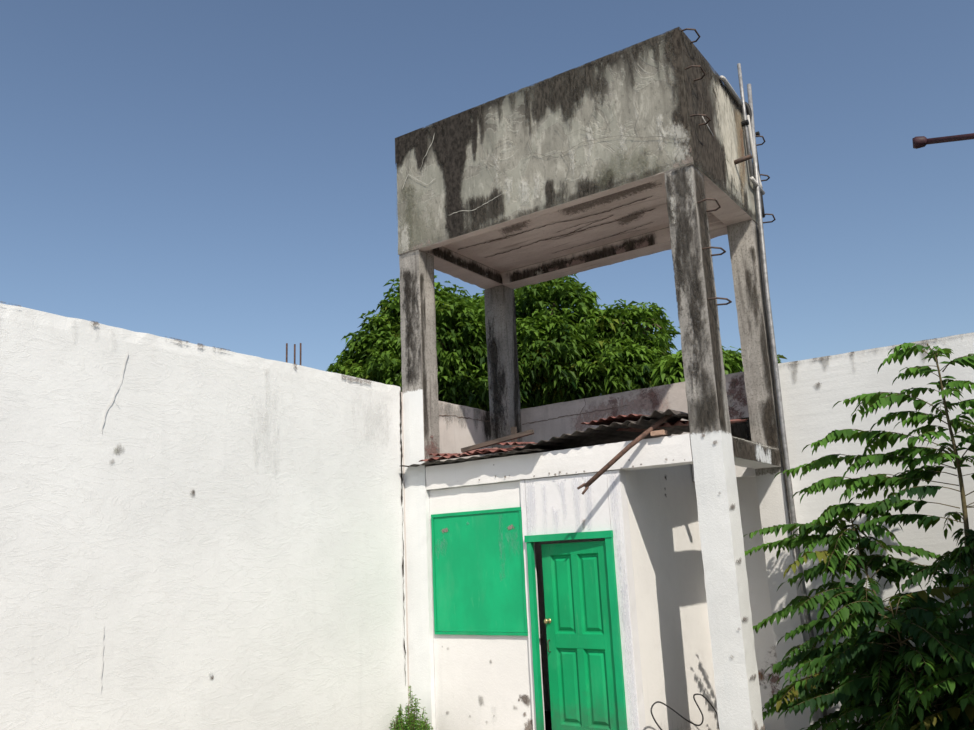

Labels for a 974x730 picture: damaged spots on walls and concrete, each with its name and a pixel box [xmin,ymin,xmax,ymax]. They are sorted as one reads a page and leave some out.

crack [458,196,656,258]
water stain [395,27,796,561]
peeling [518,694,533,730]